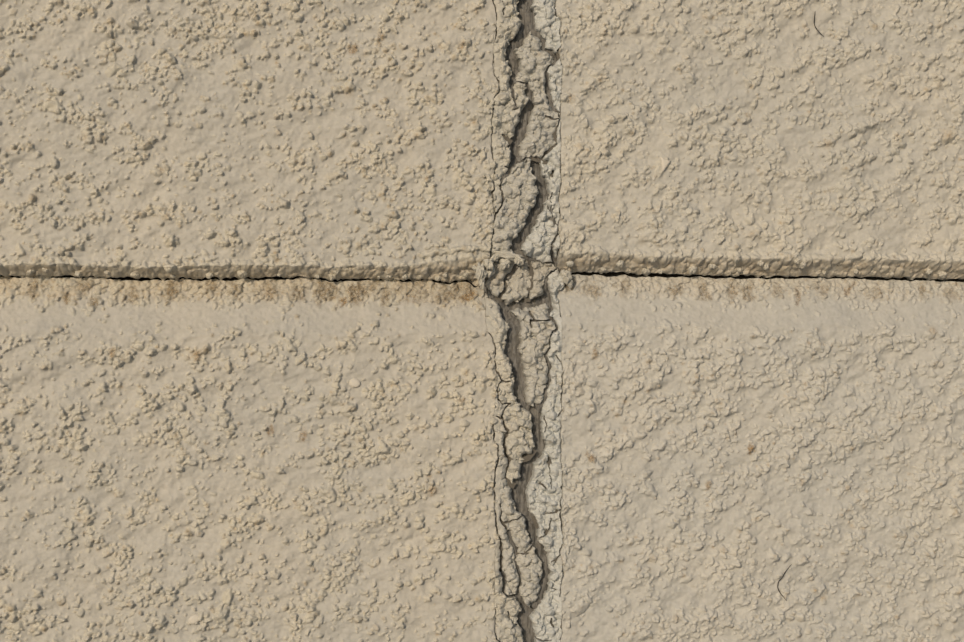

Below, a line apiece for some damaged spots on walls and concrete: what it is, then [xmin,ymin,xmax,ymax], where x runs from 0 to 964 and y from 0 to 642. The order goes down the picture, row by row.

crack [51,274,383,282]
crack [399,0,964,642]